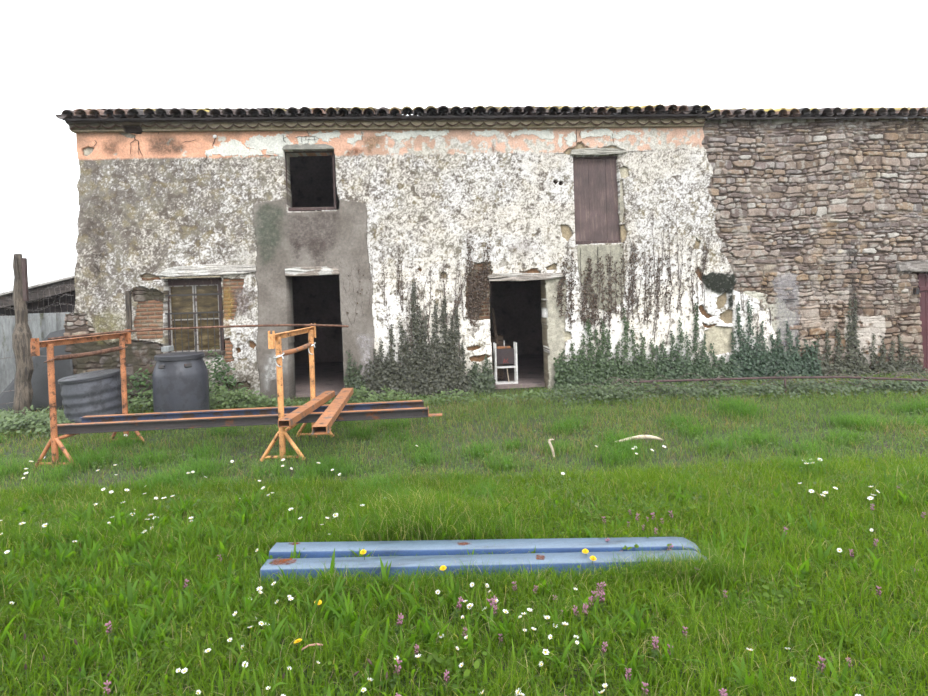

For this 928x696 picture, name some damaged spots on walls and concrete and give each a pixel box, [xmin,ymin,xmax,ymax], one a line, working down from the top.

peeling [205,130,364,159]
peeling [375,129,449,144]
peeling [471,128,641,155]
spalling [223,278,244,320]
spalling [465,262,493,320]
spalling [63,274,164,409]
spalling [699,292,734,355]